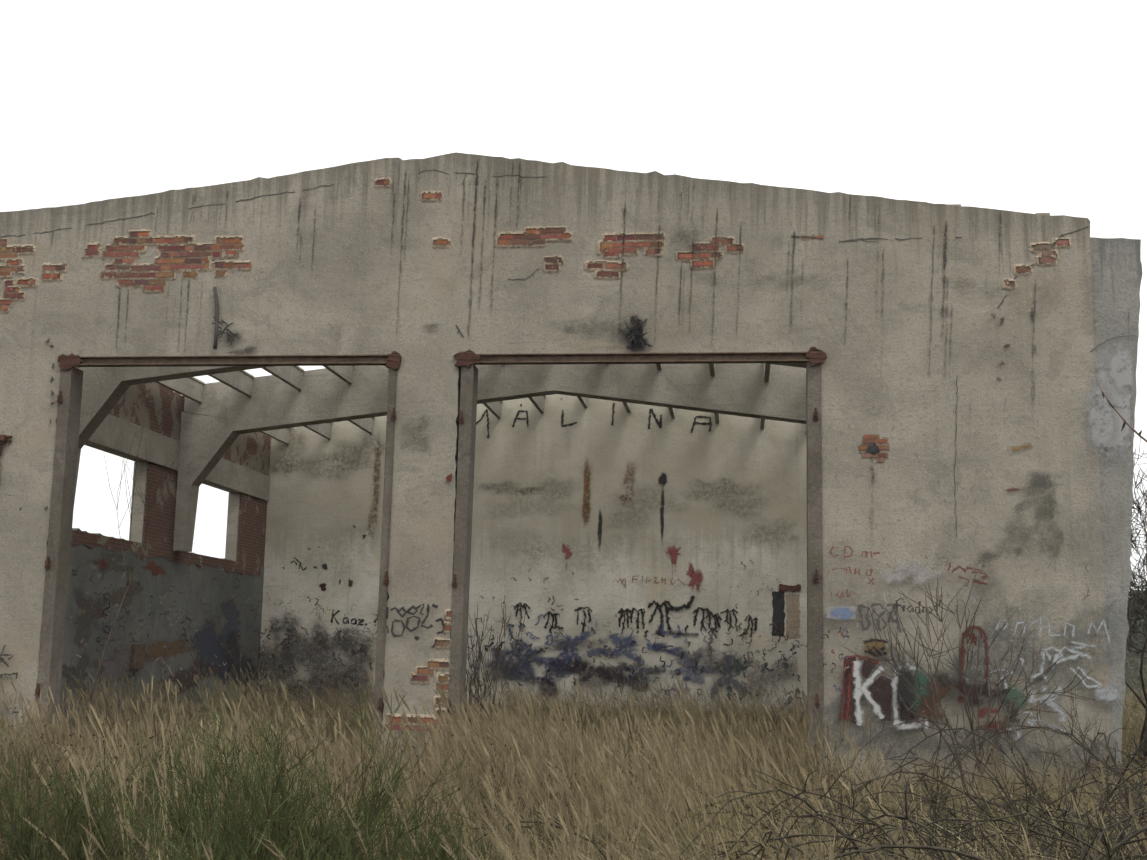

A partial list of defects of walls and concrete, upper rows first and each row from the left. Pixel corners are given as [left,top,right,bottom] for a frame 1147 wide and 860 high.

spalling [0,237,69,314]
spalling [82,228,254,293]
leakage [463,161,498,277]
spalling [495,225,573,273]
spalling [583,231,746,280]
spalling [1002,236,1073,290]
crack [997,226,1088,308]
spalling [858,434,889,464]
rust [583,463,591,521]
spalling [381,607,452,735]